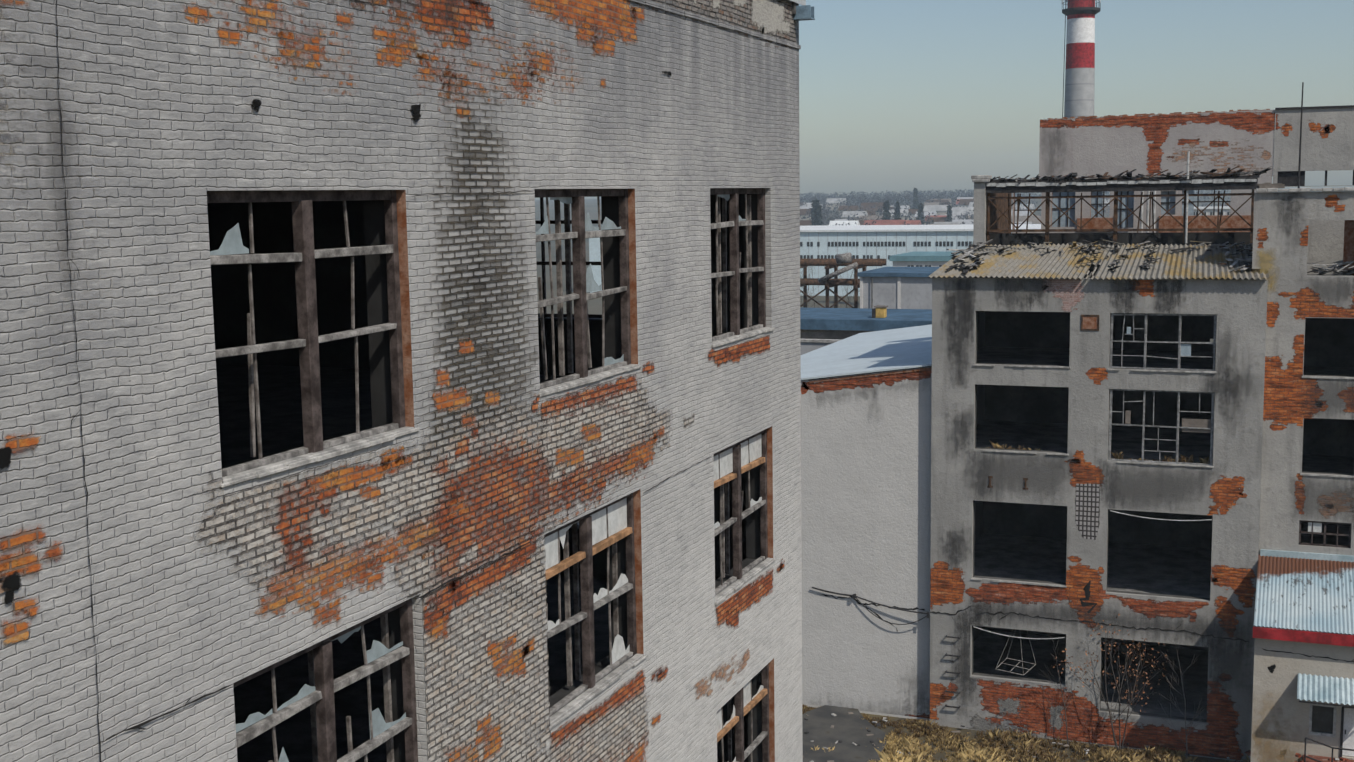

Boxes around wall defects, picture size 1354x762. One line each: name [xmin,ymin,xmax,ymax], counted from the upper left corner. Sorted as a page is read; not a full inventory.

peeling [185,0,797,119]
spalling [411,104,421,122]
flaking render [1040,112,1293,176]
leakage [422,102,536,500]
flaking render [801,368,932,394]
flaking render [1263,287,1354,431]
peeling [0,434,41,469]
flaking render [1207,475,1247,515]
peeling [0,527,63,644]
peeling [196,361,694,762]
flaking render [930,556,1257,637]
flaking render [967,673,1251,760]